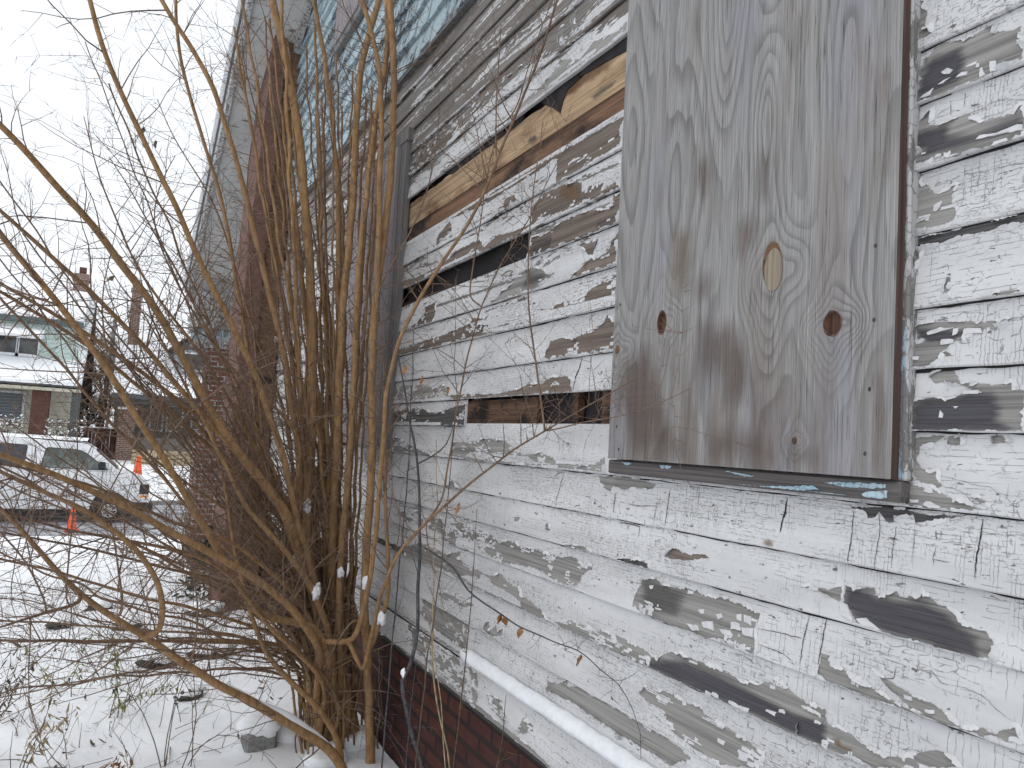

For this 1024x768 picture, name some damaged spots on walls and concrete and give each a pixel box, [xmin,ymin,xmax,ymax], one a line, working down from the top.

peeling [918,0,935,39]
peeling [408,12,627,175]
peeling [913,22,1024,270]
peeling [398,116,624,360]
peeling [979,286,1024,299]
peeling [392,374,575,426]
peeling [725,316,1024,526]
crack [613,491,670,537]
crack [874,518,950,565]
crack [944,476,1020,578]
peeling [377,509,963,768]
peeling [799,581,999,663]